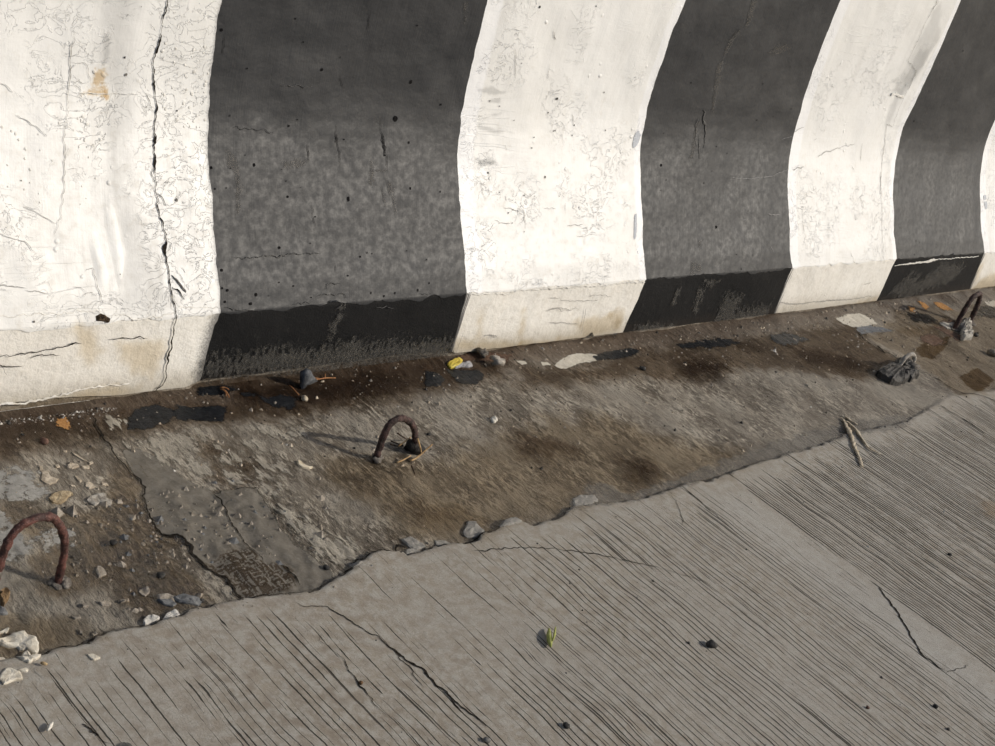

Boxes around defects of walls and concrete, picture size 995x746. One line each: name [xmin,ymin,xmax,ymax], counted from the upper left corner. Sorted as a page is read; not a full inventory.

crack [113,0,184,392]
crack [0,342,81,374]
crack [93,417,268,608]
crack [215,487,486,726]
crack [879,587,966,673]